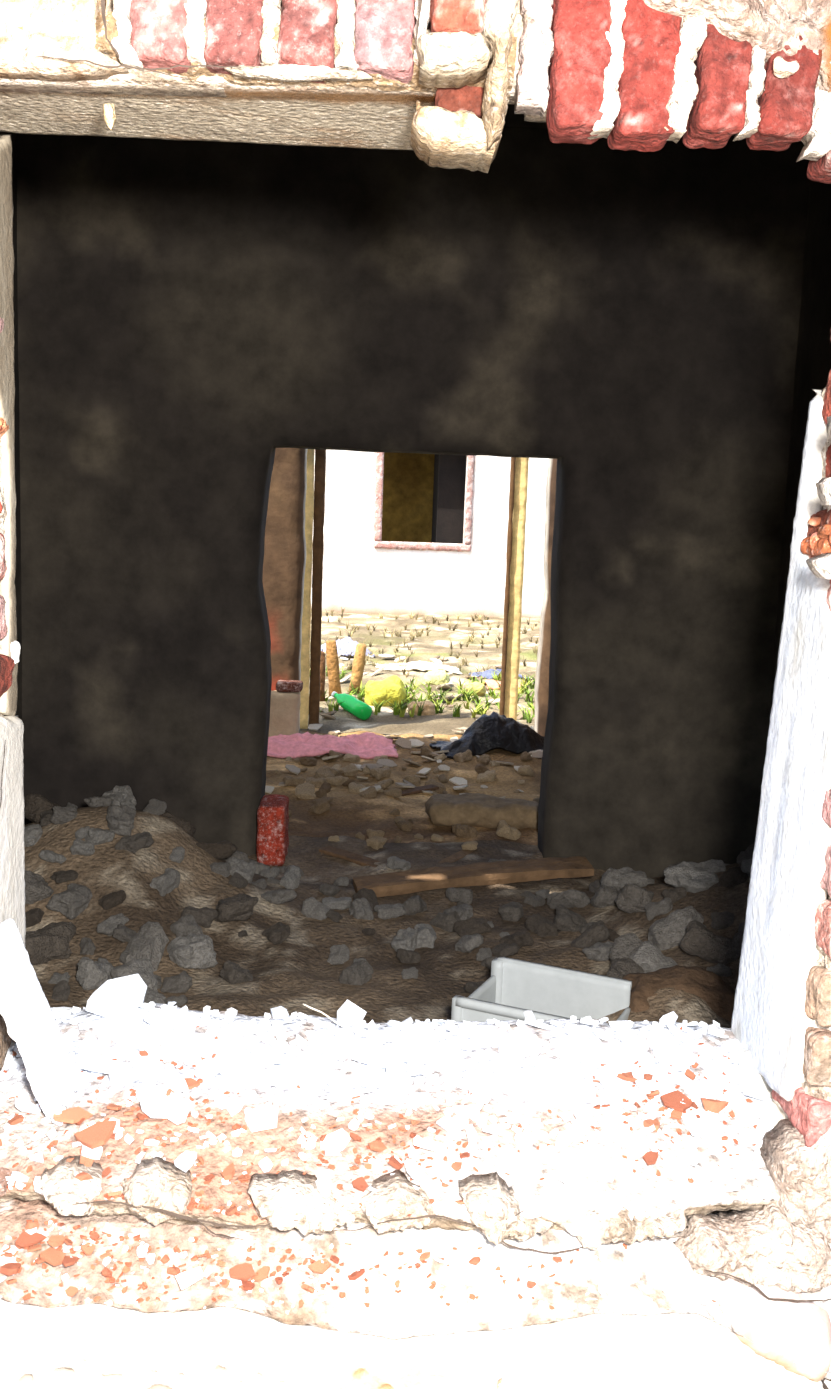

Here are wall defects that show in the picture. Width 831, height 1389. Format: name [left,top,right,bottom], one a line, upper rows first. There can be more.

flaking render [0,134,26,946]
flaking render [442,389,831,1382]
spalling [0,953,436,1297]
crack [330,1210,690,1254]
crack [704,1269,831,1303]